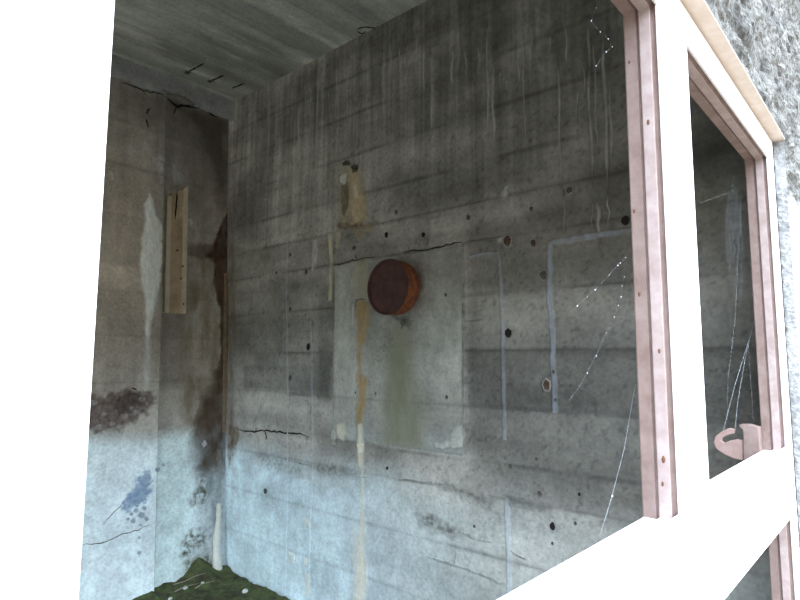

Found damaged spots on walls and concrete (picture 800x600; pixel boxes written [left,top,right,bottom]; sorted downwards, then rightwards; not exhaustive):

crack [83,506,150,545]
water stain [89,189,163,438]
crack [122,82,228,120]
crack [238,256,374,486]
rust [330,256,373,600]
spalling [335,159,378,242]